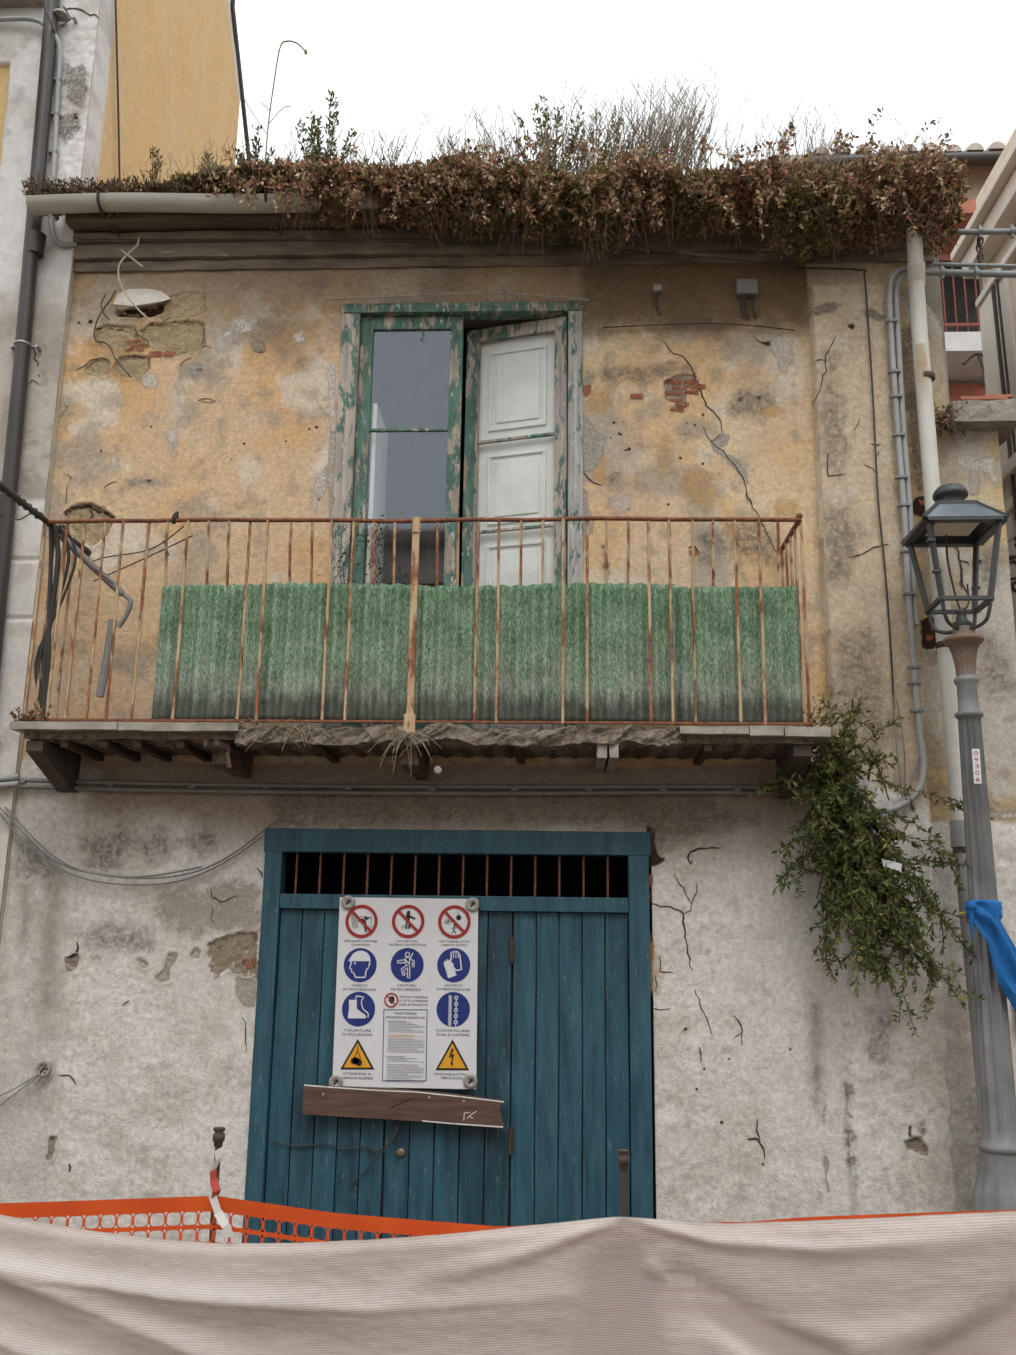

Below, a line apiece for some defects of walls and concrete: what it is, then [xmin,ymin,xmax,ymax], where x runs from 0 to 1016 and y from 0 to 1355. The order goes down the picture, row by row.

flaking render [78,289,266,378]
flaking render [583,363,705,435]
crack [663,341,777,552]
flaking render [66,502,115,546]
peeling [157,881,261,1006]
crack [651,847,743,1062]